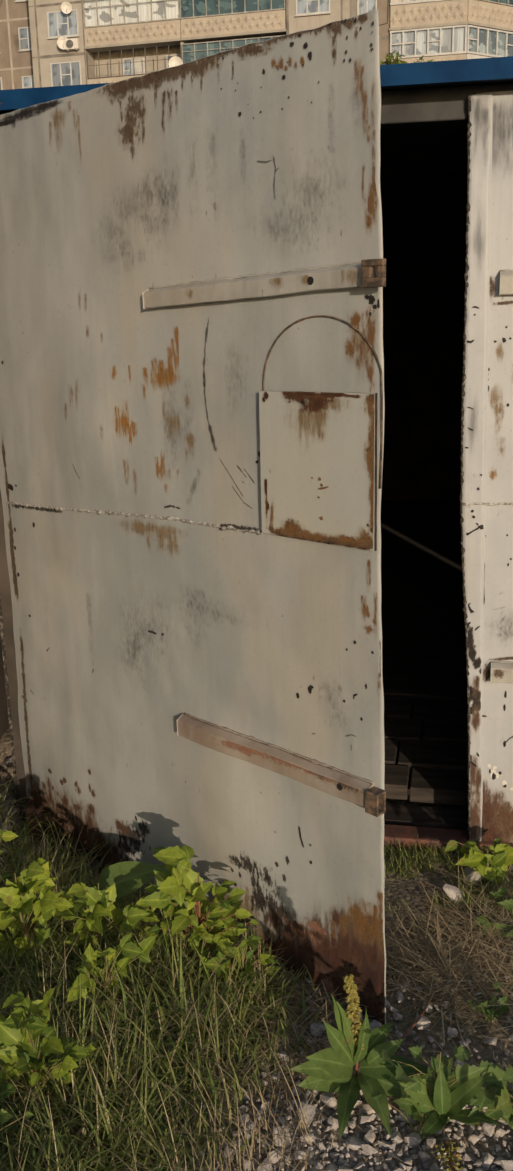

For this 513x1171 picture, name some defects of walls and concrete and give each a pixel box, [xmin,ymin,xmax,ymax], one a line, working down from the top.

rust [99,13,367,158]
rust [355,62,376,228]
rust [112,327,179,399]
rust [115,406,135,444]
rust [132,523,177,554]
rust [264,311,381,688]
rust [472,710,480,730]
rust [470,759,513,843]
rust [225,890,385,1025]